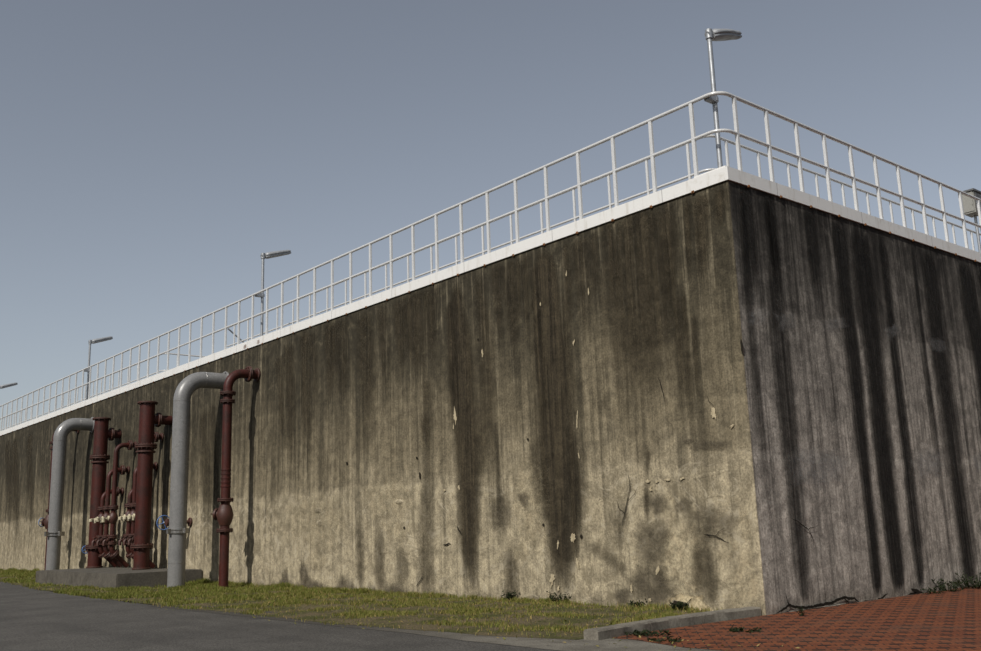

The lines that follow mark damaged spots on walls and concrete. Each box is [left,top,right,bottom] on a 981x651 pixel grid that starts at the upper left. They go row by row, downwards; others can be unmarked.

damp [300,563,322,589]
damp [447,284,492,579]
damp [533,255,581,582]
crack [776,588,923,614]